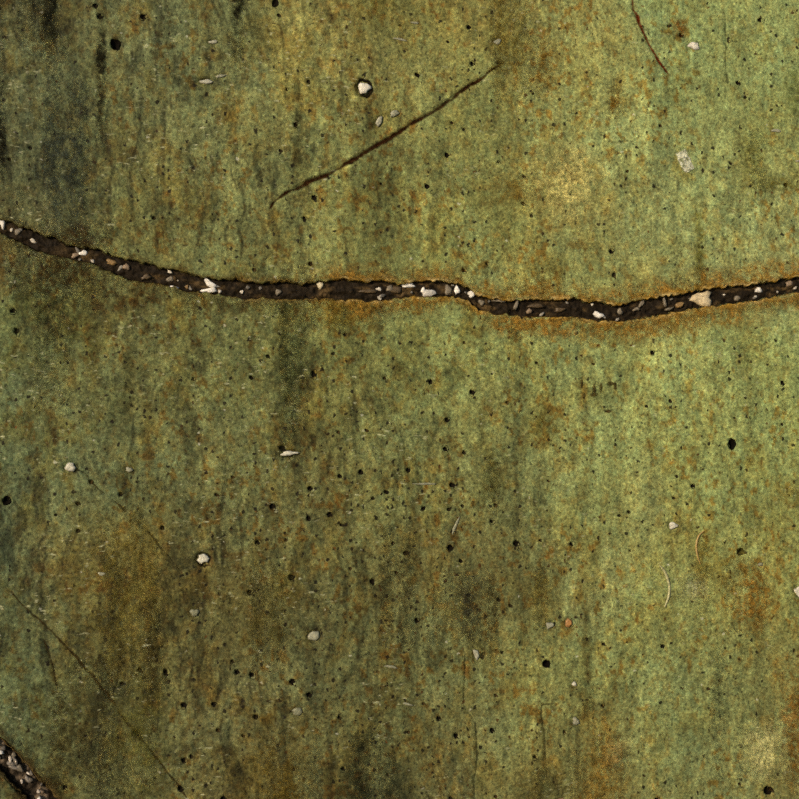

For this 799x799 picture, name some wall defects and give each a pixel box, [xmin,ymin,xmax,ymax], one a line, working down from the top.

water stain [96,33,105,122]
crack [270,62,503,209]
crack [0,220,799,337]
crack [0,731,61,799]